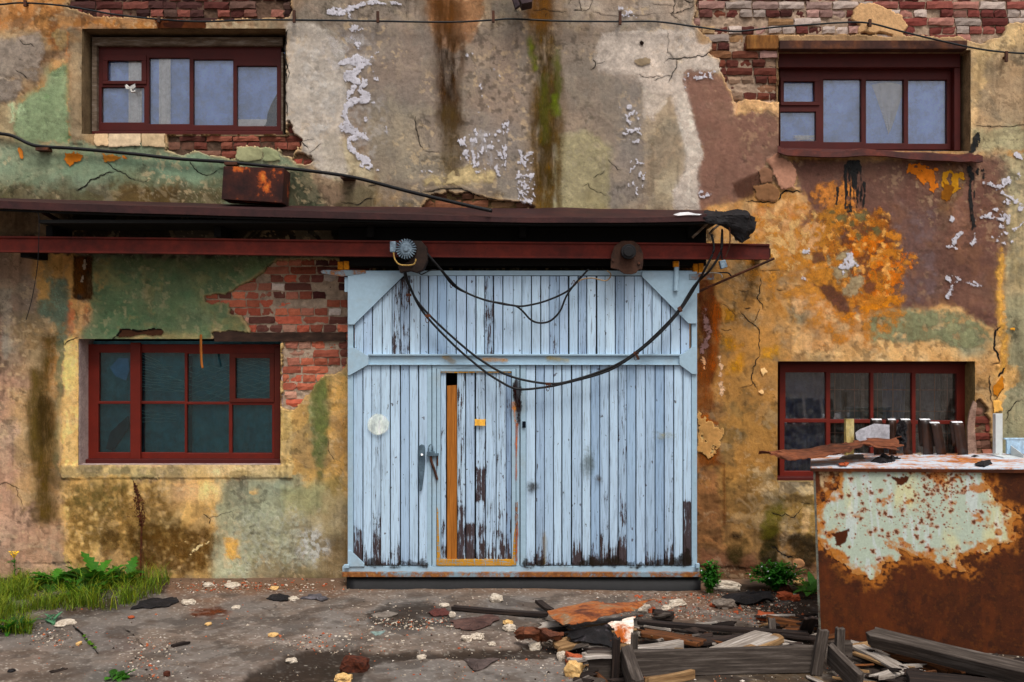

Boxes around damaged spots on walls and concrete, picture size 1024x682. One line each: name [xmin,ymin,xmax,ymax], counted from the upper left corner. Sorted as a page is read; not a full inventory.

peeling [64,151,83,166]
crack [76,162,150,191]
spalling [69,0,344,173]
leakage [327,0,402,171]
leakage [435,0,562,208]
crack [534,0,709,81]
spalling [597,0,1024,216]
leakage [980,173,1024,245]
spalling [206,259,373,410]
crack [722,270,781,388]
crack [989,327,1021,421]
leakage [27,336,214,574]